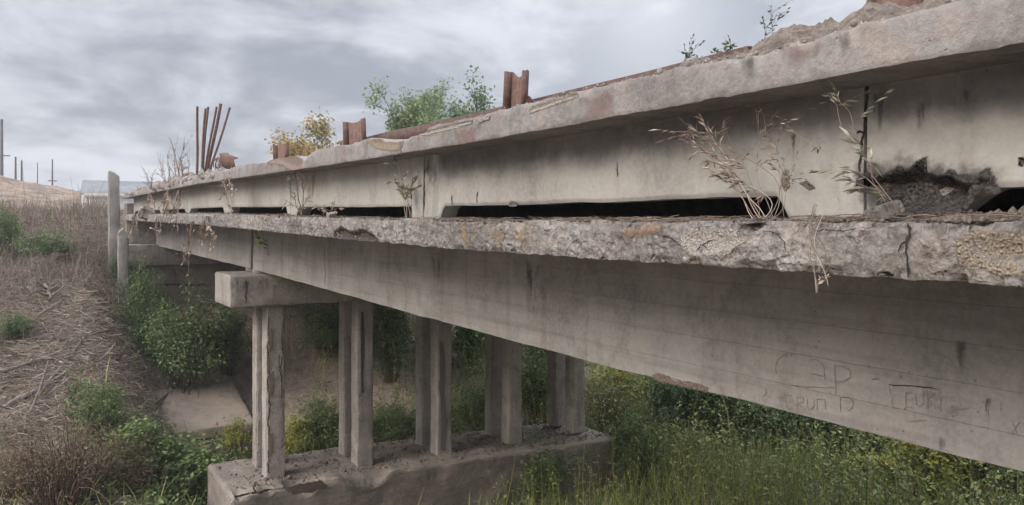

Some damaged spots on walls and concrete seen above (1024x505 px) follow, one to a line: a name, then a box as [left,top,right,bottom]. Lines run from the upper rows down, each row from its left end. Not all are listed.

crack [857,86,869,172]
spalling [855,156,1001,219]
spalling [333,226,378,242]
crack [898,223,912,279]
crack [277,317,285,409]
spalling [652,373,709,392]